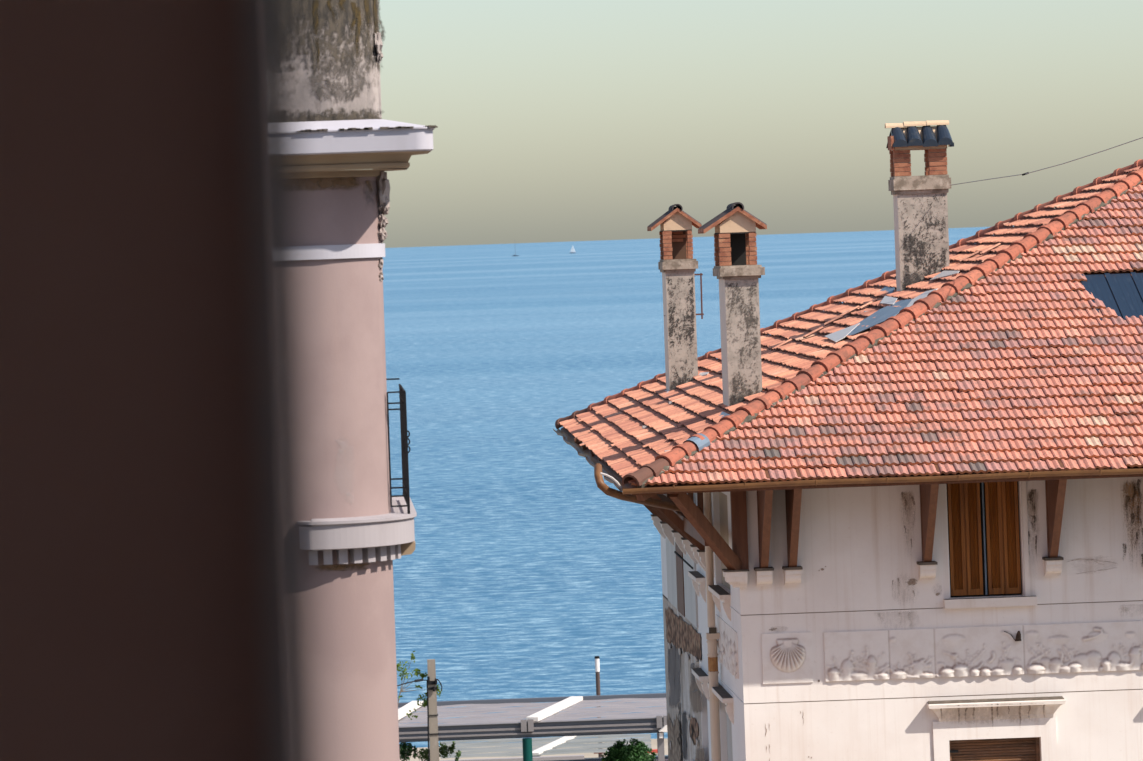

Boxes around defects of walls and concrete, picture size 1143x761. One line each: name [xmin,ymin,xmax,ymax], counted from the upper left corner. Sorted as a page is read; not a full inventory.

damp [290,0,384,122]
damp [901,193,947,291]
damp [668,277,694,391]
damp [728,283,760,406]
flaking render [665,607,701,662]